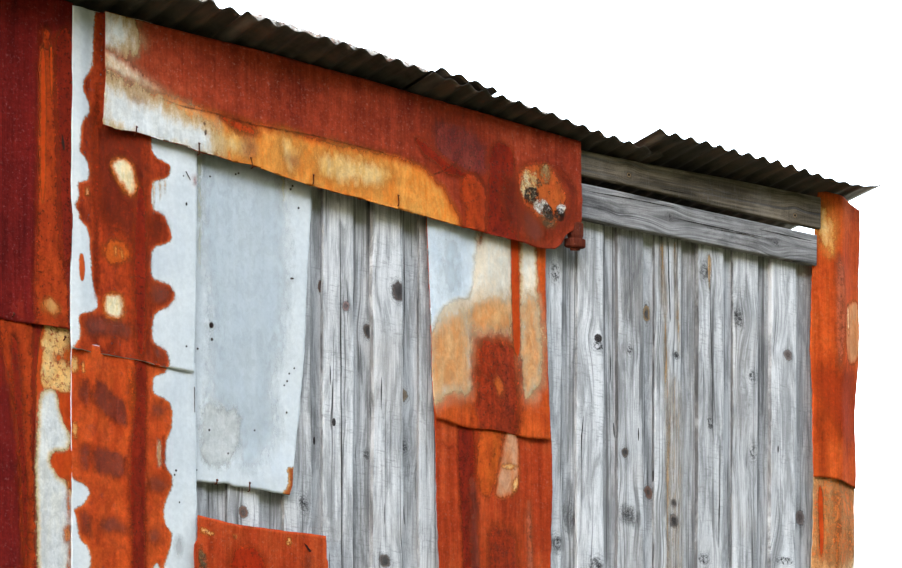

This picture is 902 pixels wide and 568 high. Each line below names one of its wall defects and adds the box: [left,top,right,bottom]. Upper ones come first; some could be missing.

rust [0,12,175,568]
rust [149,92,577,568]
rust [812,255,856,568]